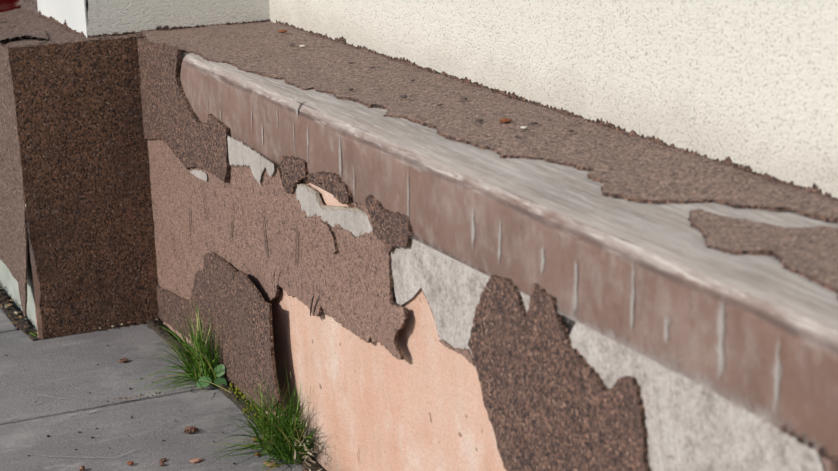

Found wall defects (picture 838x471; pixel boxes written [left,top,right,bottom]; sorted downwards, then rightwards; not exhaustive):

peeling [137,21,838,471]